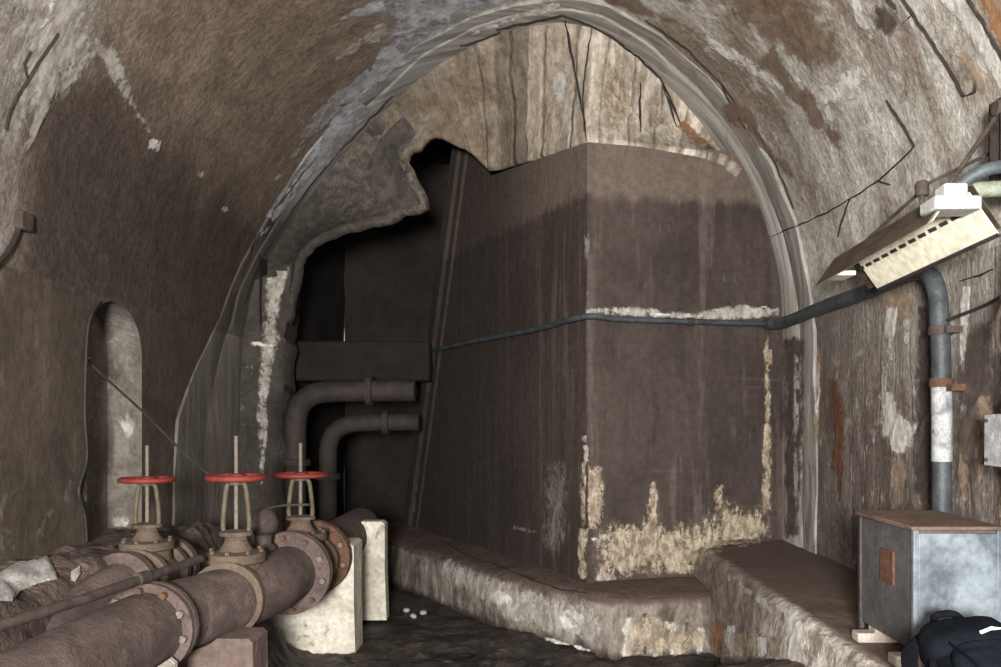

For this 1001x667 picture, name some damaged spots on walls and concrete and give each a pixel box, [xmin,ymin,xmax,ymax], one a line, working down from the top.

crack [460,15,682,142]
crack [645,19,915,237]
crack [902,0,977,96]
rust [974,0,1001,44]
spalling [252,268,289,484]
rust [829,360,845,501]